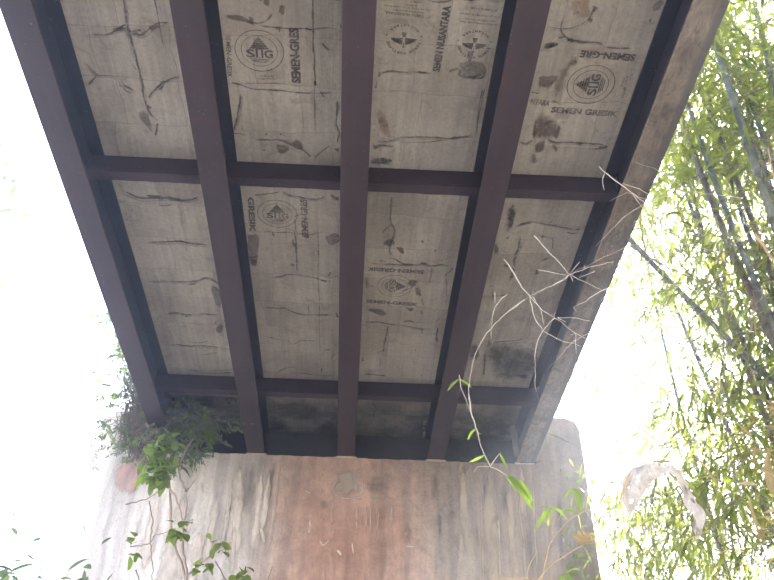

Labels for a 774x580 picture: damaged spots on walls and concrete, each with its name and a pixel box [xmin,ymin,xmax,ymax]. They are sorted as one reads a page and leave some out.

water stain [492,347,536,378]
water stain [158,470,245,580]
water stain [251,472,280,548]
water stain [480,469,538,580]